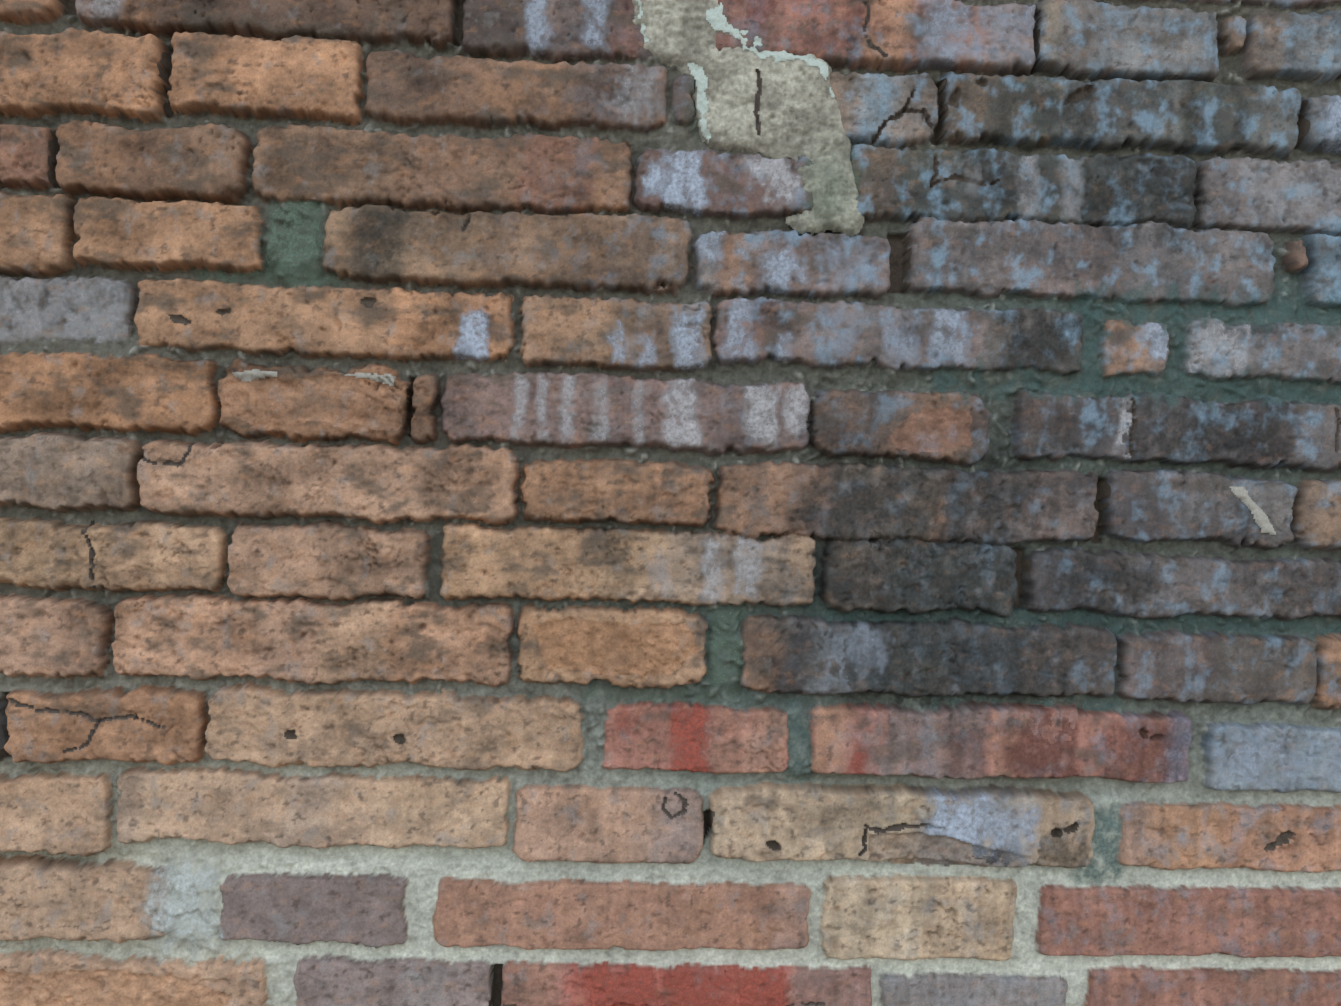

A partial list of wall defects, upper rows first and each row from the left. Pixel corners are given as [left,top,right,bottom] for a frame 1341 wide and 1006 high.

peeling [632,0,864,237]
damp [643,151,707,216]
damp [747,158,799,201]
damp [766,250,805,294]
damp [720,298,754,360]
damp [931,308,964,367]
damp [1144,323,1168,359]
damp [663,310,703,446]
damp [745,385,809,443]
damp [1117,398,1132,460]
crack [9,698,165,753]
crack [858,823,945,856]